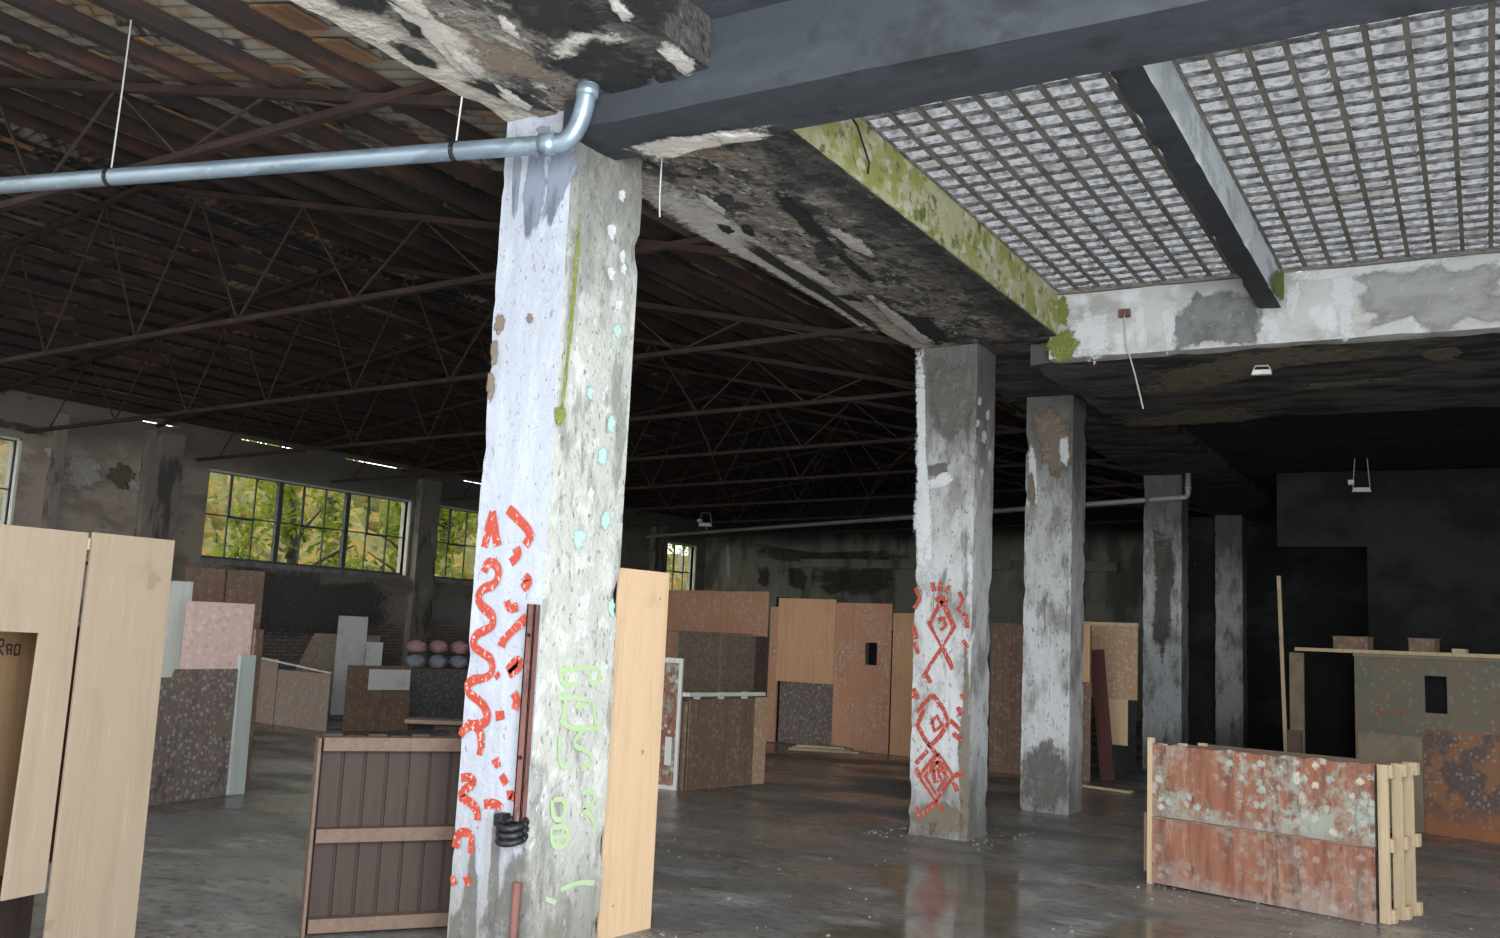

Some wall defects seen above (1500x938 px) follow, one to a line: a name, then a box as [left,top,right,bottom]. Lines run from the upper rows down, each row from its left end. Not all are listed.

spalling [387,0,695,118]
peeling [607,225,627,281]
peeling [619,179,938,348]
peeling [1173,291,1263,350]
peeling [1356,264,1500,332]
water stain [1022,738,1070,812]